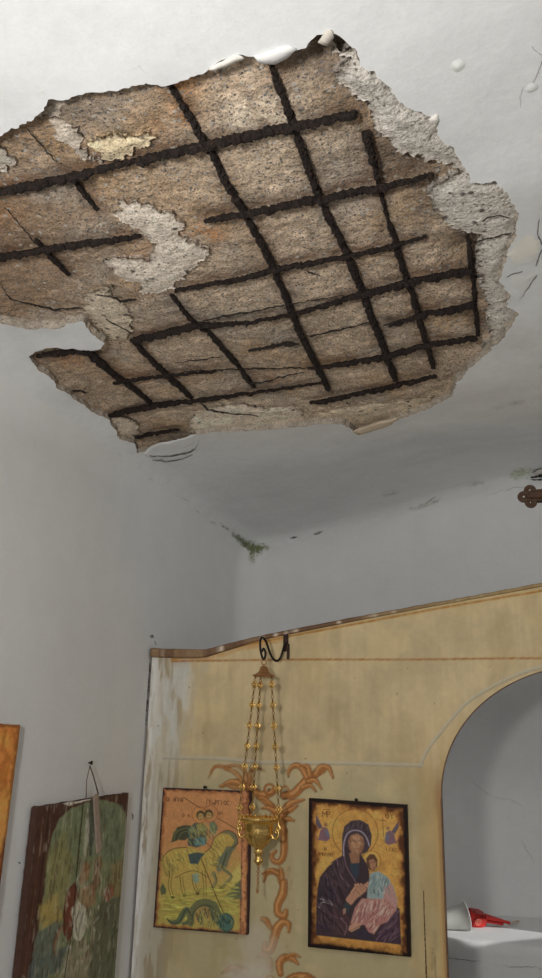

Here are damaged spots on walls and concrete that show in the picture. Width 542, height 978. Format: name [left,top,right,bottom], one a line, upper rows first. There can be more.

spalling [0,29,540,460]
crack [474,215,512,243]
crack [508,222,542,298]